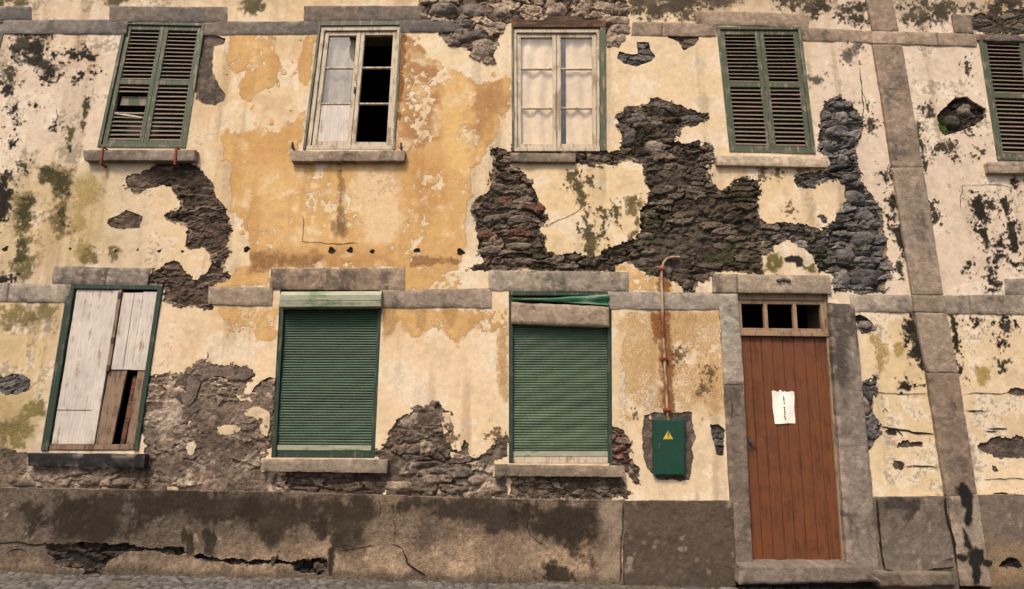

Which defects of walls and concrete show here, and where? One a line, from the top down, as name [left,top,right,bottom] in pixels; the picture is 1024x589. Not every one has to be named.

mould [0,34,107,148]
spalling [937,98,983,136]
mould [0,158,34,233]
spalling [123,0,894,342]
rust [658,277,671,292]
spalling [0,307,730,500]
rust [651,309,675,414]
spalling [977,435,1024,472]
crack [0,541,46,553]
water stain [18,485,378,576]
crack [329,502,425,575]
water stain [955,482,1024,586]